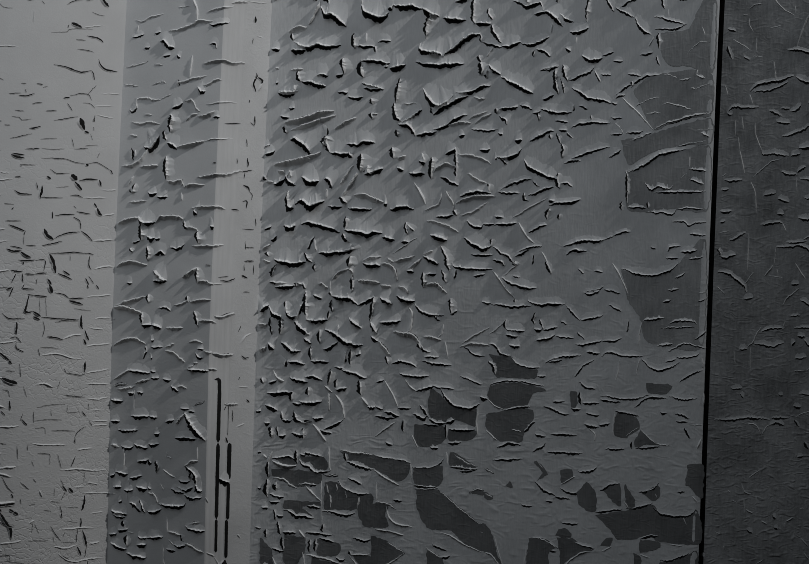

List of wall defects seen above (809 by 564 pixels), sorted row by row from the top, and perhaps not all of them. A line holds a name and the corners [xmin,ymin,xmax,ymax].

peeling [788,15,809,54]
peeling [116,0,234,286]
peeling [721,62,809,192]
peeling [751,101,809,278]
peeling [109,294,216,564]
peeling [255,0,763,564]
peeling [734,313,809,370]